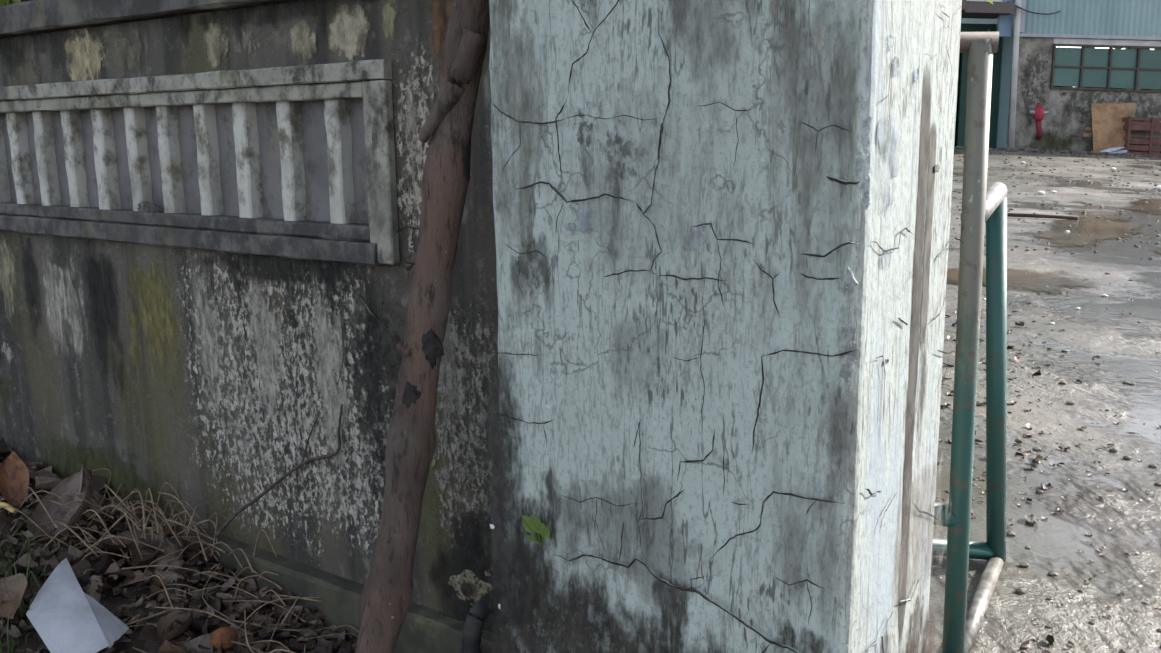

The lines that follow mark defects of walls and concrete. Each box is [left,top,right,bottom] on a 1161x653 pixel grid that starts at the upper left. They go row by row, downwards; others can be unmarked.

damp [0,239,162,396]
damp [203,252,405,520]
damp [430,363,721,653]
crack [490,0,938,653]
damp [780,625,823,653]